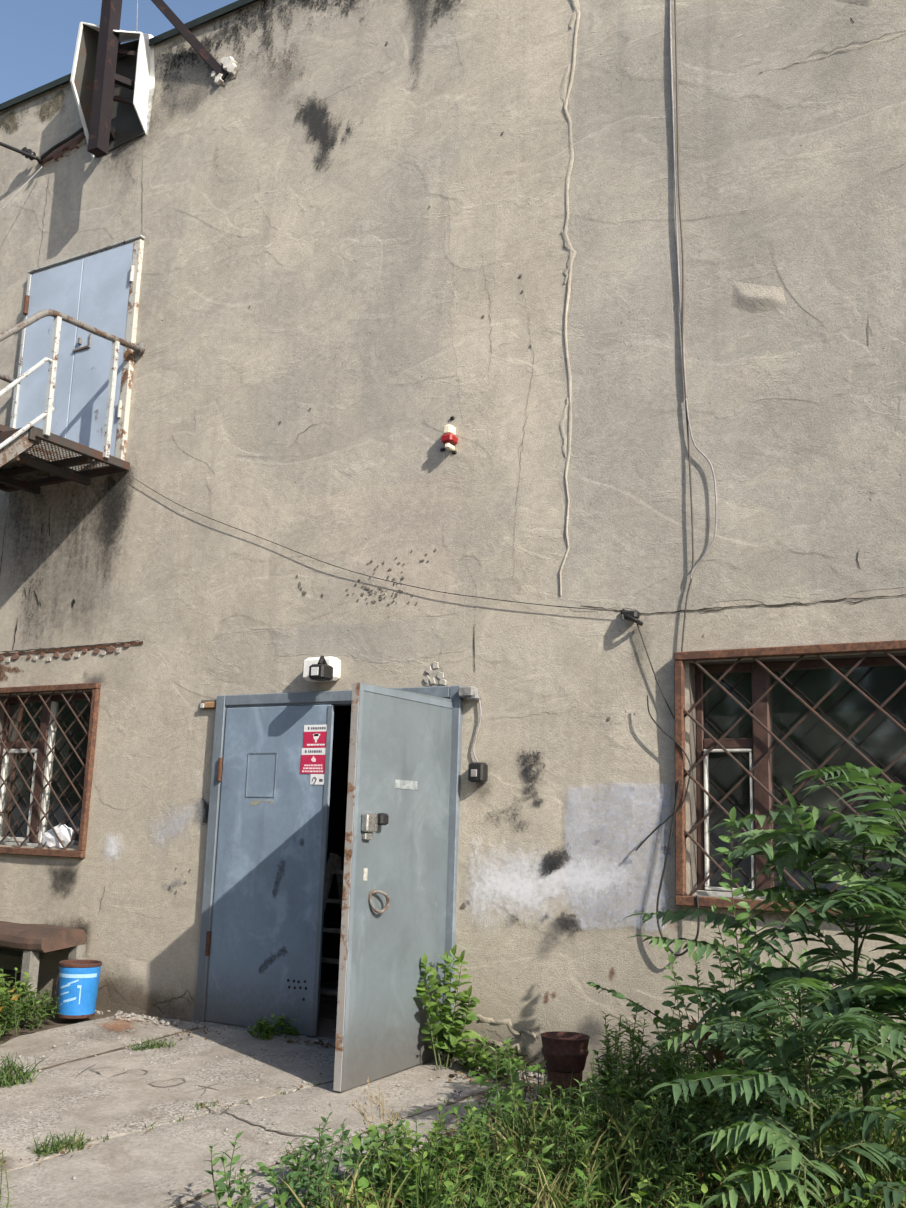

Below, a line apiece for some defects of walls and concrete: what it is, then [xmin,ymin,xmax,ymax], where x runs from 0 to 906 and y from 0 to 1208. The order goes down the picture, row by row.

damp [162,0,364,89]
damp [411,0,462,73]
crack [759,18,906,73]
damp [295,96,350,170]
damp [83,478,125,545]
spalling [0,640,143,663]
damp [518,754,545,807]
damp [541,843,570,876]
damp [553,912,580,940]